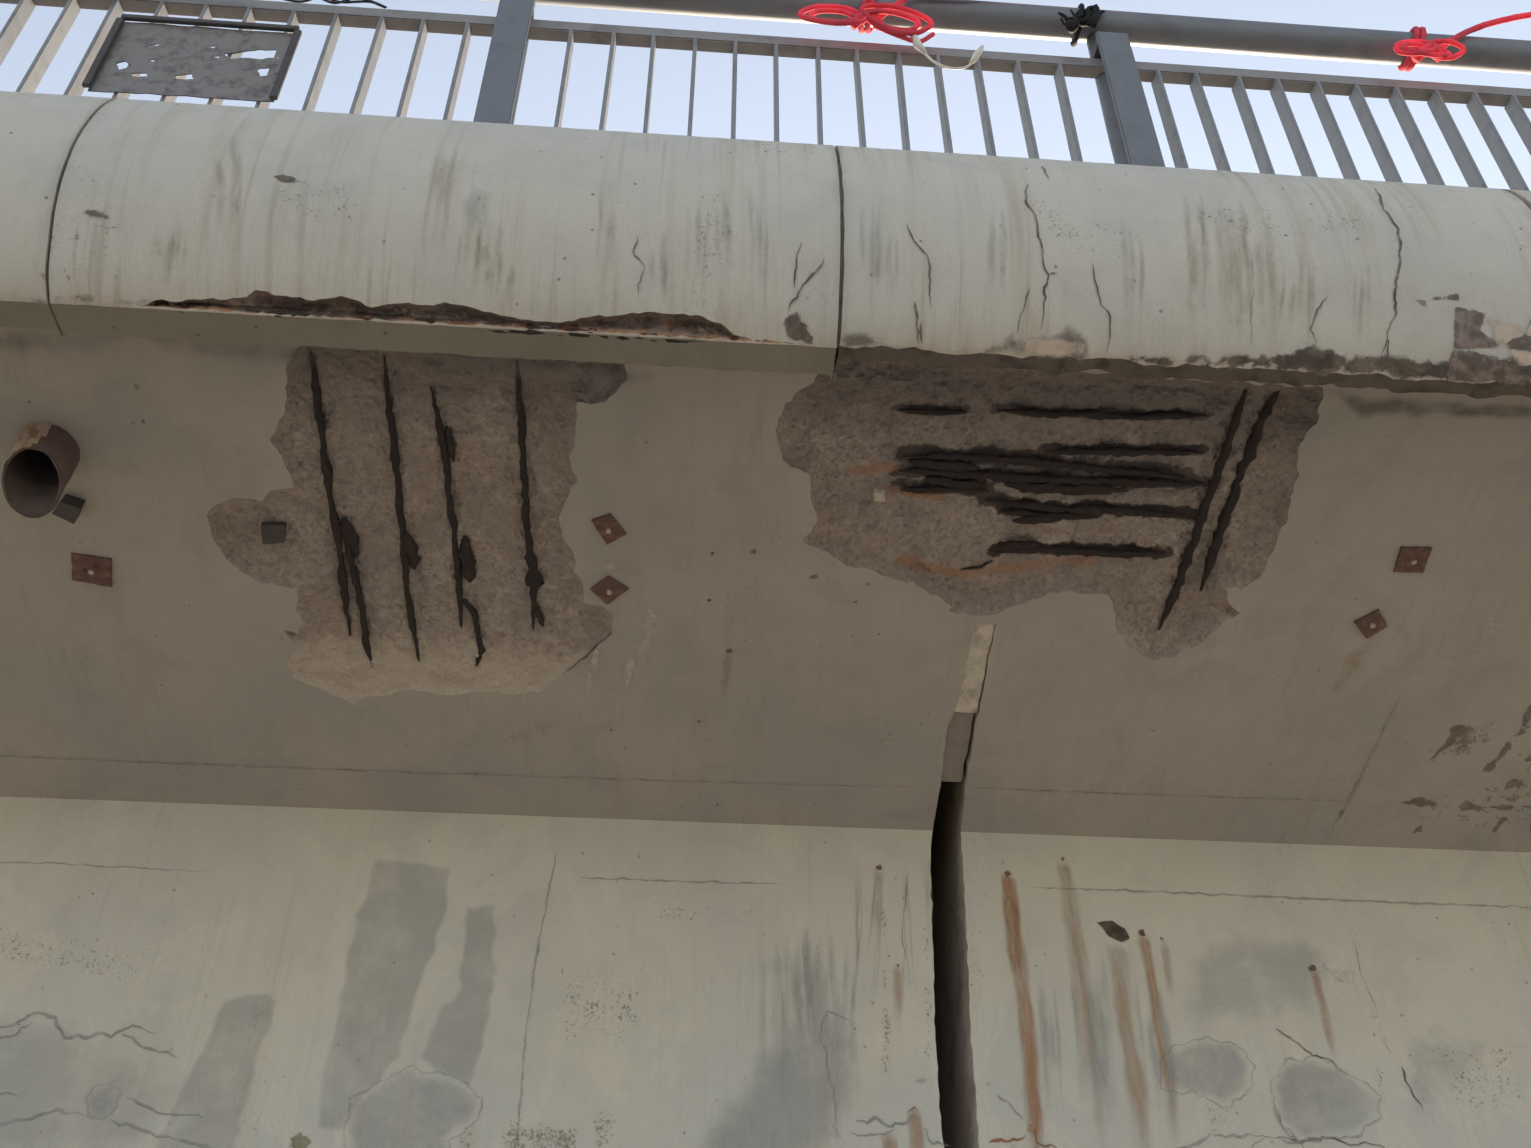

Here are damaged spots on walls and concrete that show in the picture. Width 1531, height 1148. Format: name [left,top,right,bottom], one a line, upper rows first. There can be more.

spalling [142,290,793,344]
crack [1017,166,1057,333]
crack [1093,265,1111,351]
crack [1375,188,1402,364]
peeling [1418,294,1531,385]
spalling [206,346,627,704]
spalling [775,360,1324,661]
corrosion [1003,870,1040,1137]
corrosion [1118,979,1144,1116]
corrosion [1138,929,1170,1087]
leakage [290,1133,311,1148]
crack [1181,1108,1385,1148]